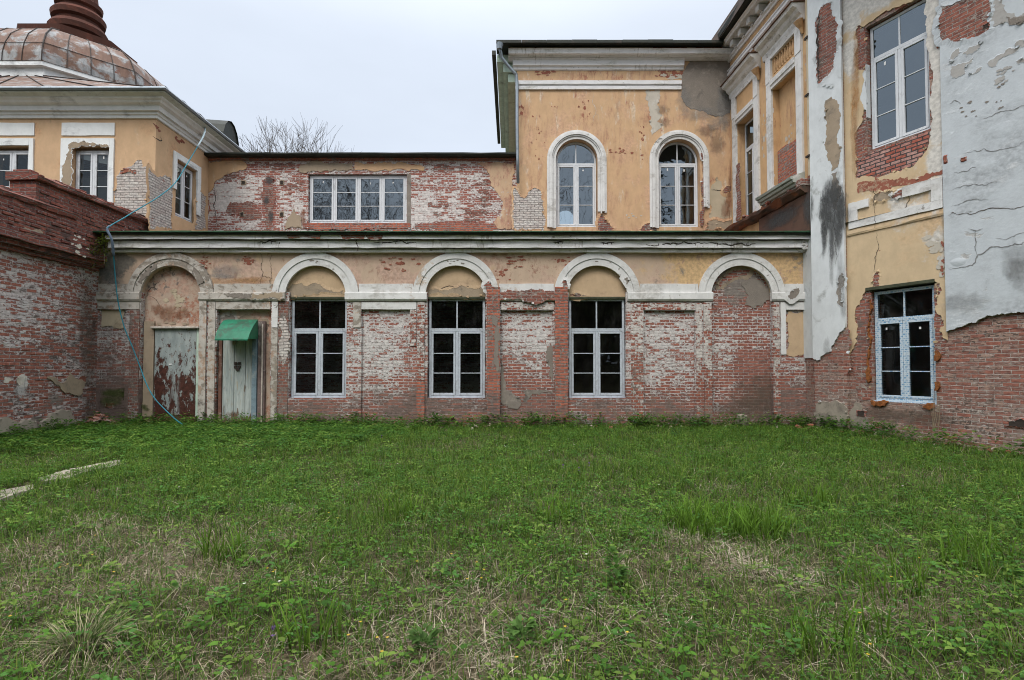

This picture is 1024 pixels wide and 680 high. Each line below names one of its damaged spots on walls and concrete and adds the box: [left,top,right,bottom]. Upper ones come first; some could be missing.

flaking render [805,0,843,88]
flaking render [931,0,1024,109]
flaking render [113,157,174,231]
flaking render [193,160,248,231]
spalling [226,160,463,230]
flaking render [307,162,547,231]
damp [766,180,848,254]
flaking render [854,122,967,206]
crack [951,141,1024,269]
flaking render [16,374,29,388]
flaking render [716,266,804,357]
flaking render [835,269,882,422]